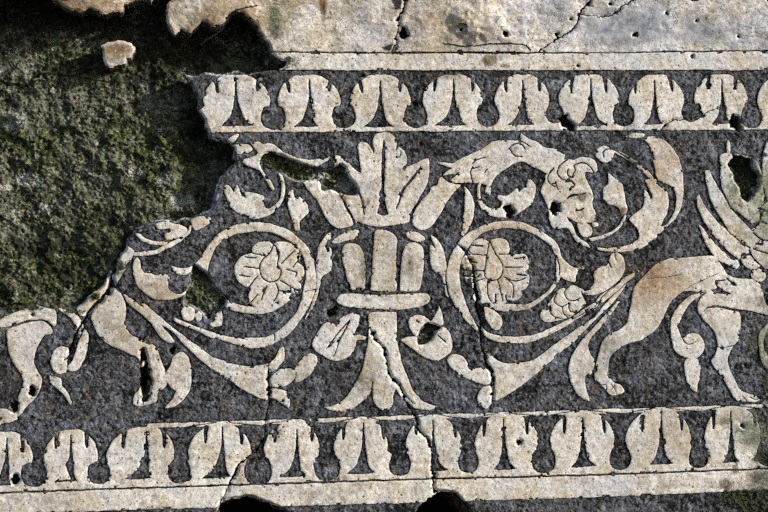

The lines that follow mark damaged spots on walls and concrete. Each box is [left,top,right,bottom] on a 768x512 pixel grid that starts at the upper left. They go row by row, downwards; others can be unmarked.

crack [391,0,416,52]
crack [442,0,634,52]
peeling [0,0,285,319]
peeling [727,155,758,201]
crack [459,246,493,405]
crack [220,364,283,502]
crack [369,328,435,490]